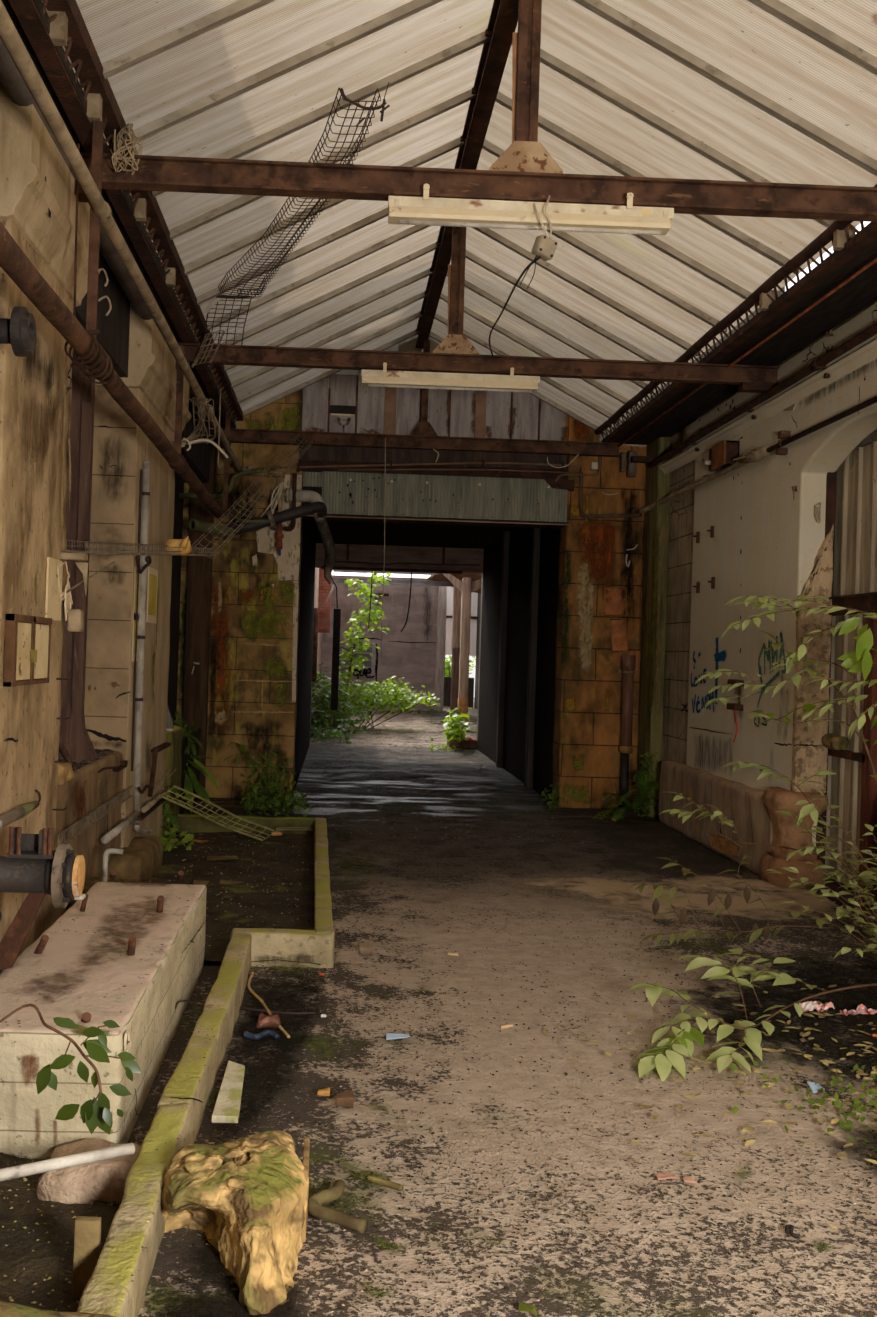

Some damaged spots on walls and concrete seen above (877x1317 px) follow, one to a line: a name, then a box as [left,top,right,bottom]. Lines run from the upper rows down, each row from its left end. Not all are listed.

water stain [27,346,71,533]
water stain [562,550,594,672]